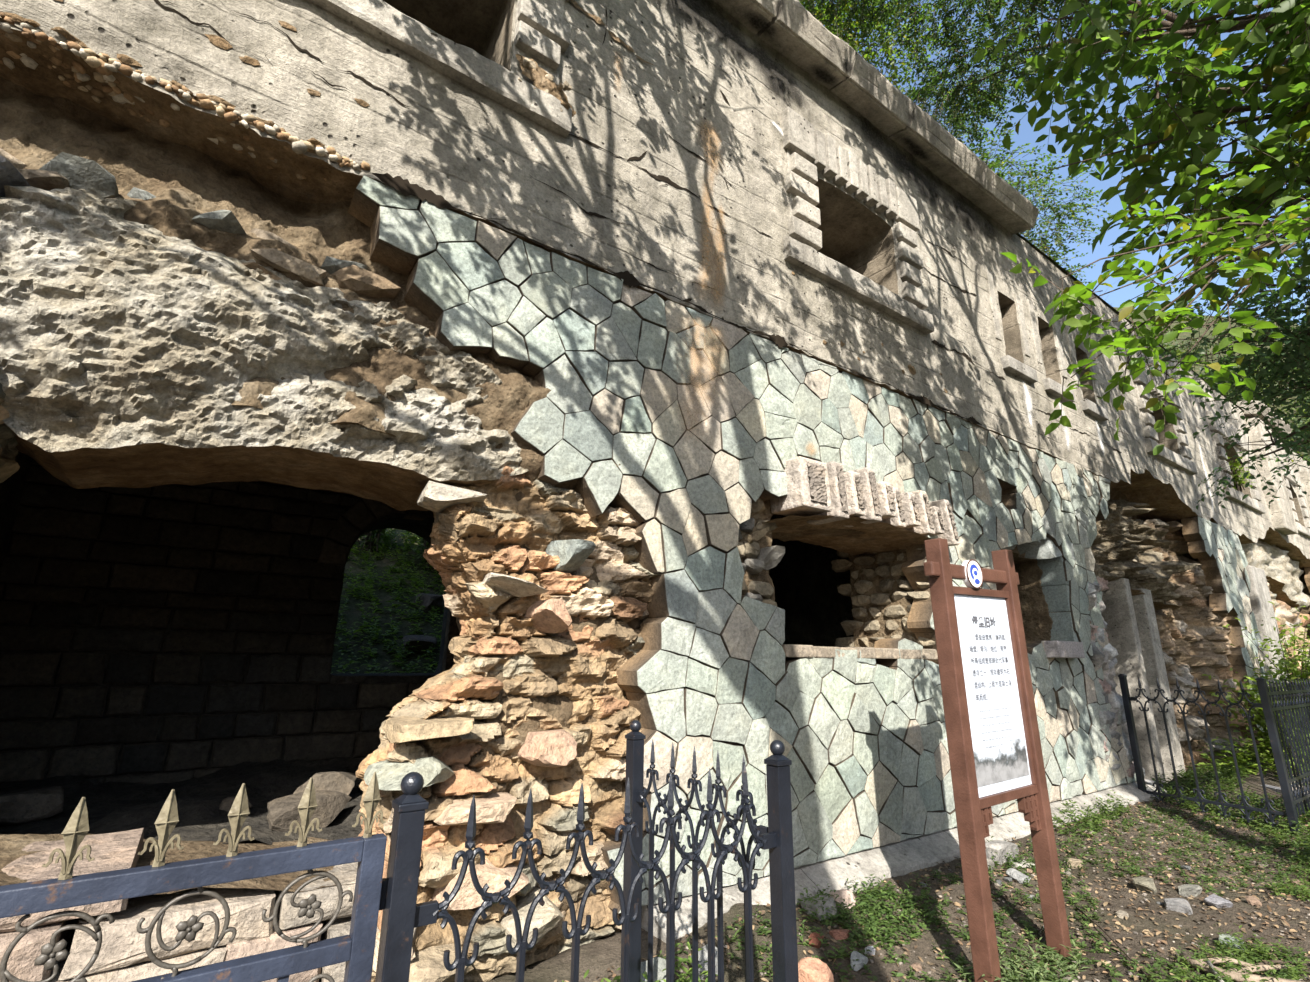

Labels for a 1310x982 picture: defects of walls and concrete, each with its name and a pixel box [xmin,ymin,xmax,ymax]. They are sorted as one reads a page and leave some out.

crack [155,0,409,107]
spalling [1241,540,1310,609]
spalling [1087,496,1202,788]